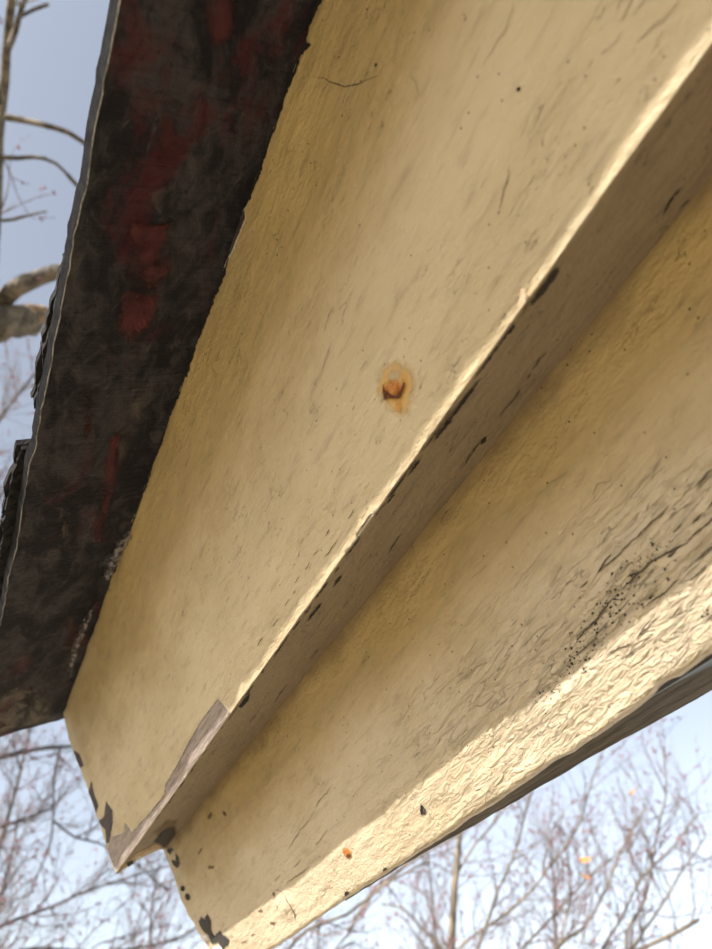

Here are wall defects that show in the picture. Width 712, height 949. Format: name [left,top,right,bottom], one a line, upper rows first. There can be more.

corrosion [377,361,412,412]
spalling [344,268,559,557]
damp [203,177,712,819]
spalling [274,567,342,657]
peeling [88,685,254,873]
spalling [198,914,228,949]